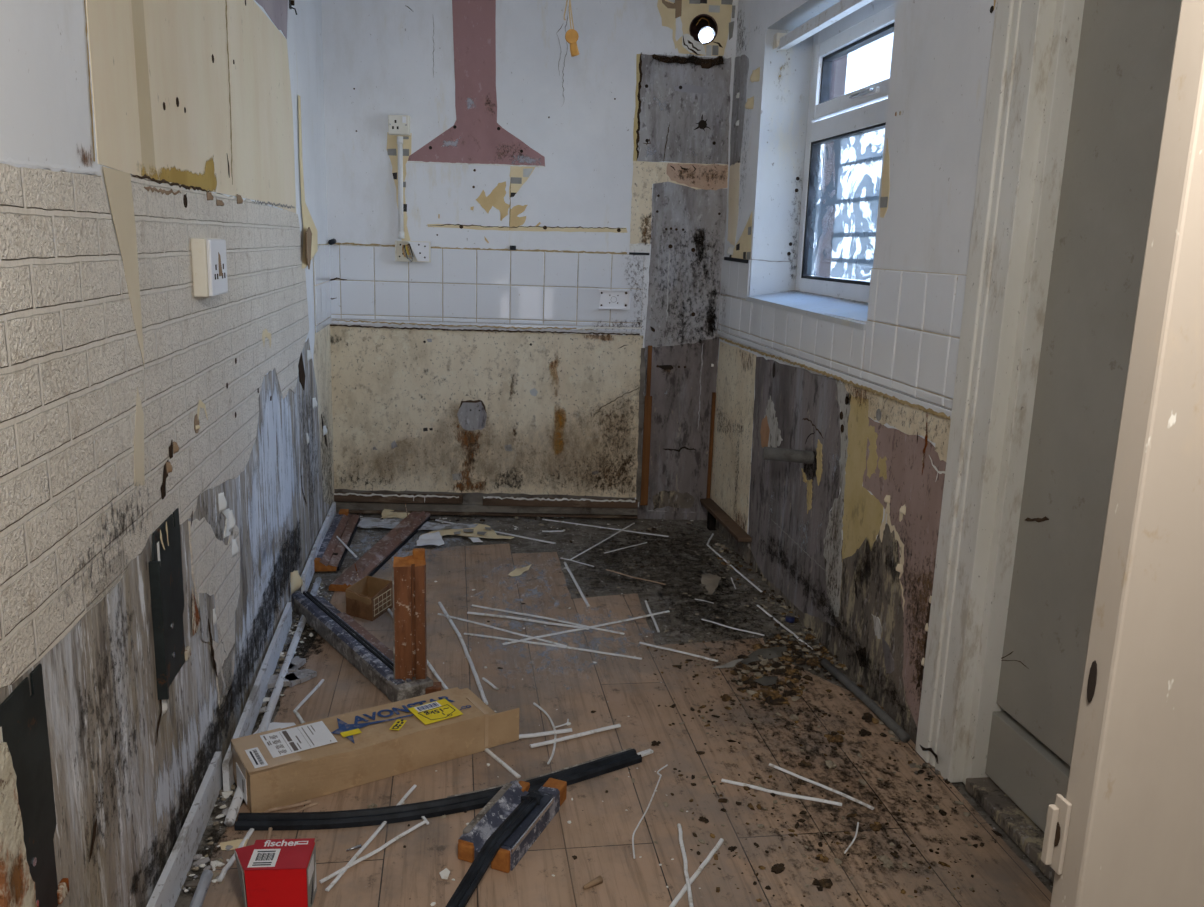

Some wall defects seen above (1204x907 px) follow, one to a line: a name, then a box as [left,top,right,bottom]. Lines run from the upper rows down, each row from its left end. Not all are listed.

flaking render [84,0,296,213]
flaking render [387,0,545,241]
peeling [657,0,723,55]
leakage [74,483,149,592]
flaking render [0,338,331,907]
corrosion [453,423,486,492]
leakage [487,464,523,490]
leakage [550,387,639,494]
flaking render [748,357,841,627]
leakage [748,523,917,745]
flaking render [863,417,950,728]